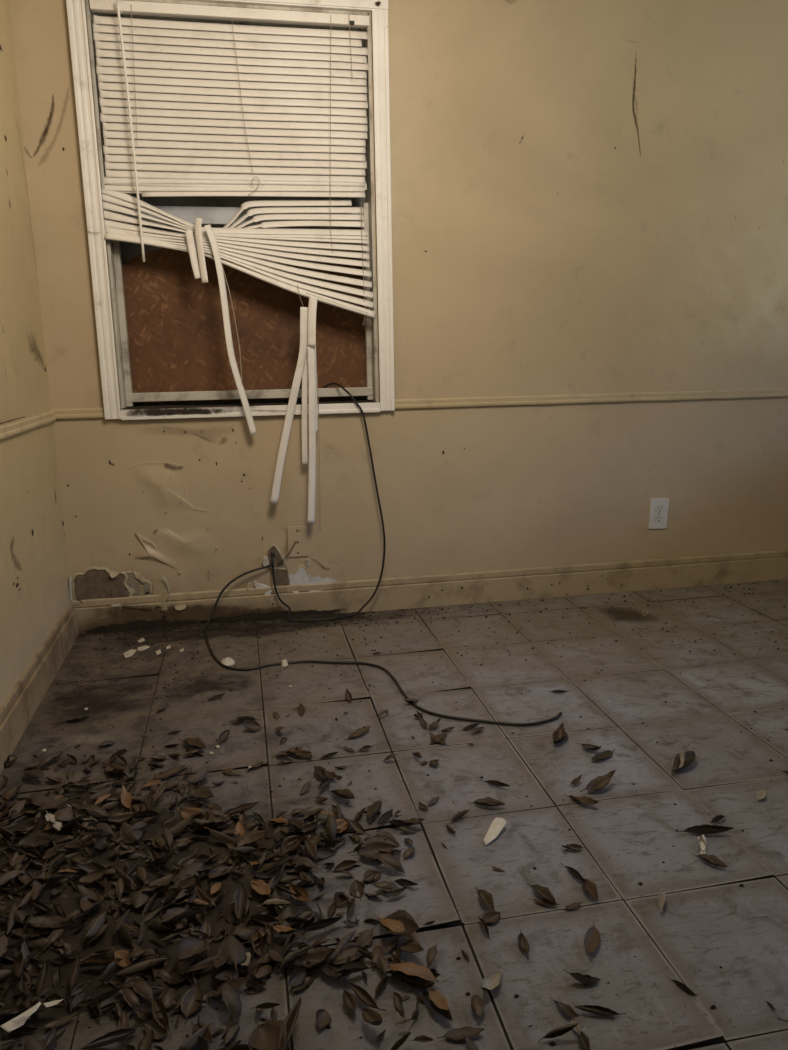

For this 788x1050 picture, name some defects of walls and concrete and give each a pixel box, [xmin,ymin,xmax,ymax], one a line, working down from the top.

flaking render [69,566,186,612]